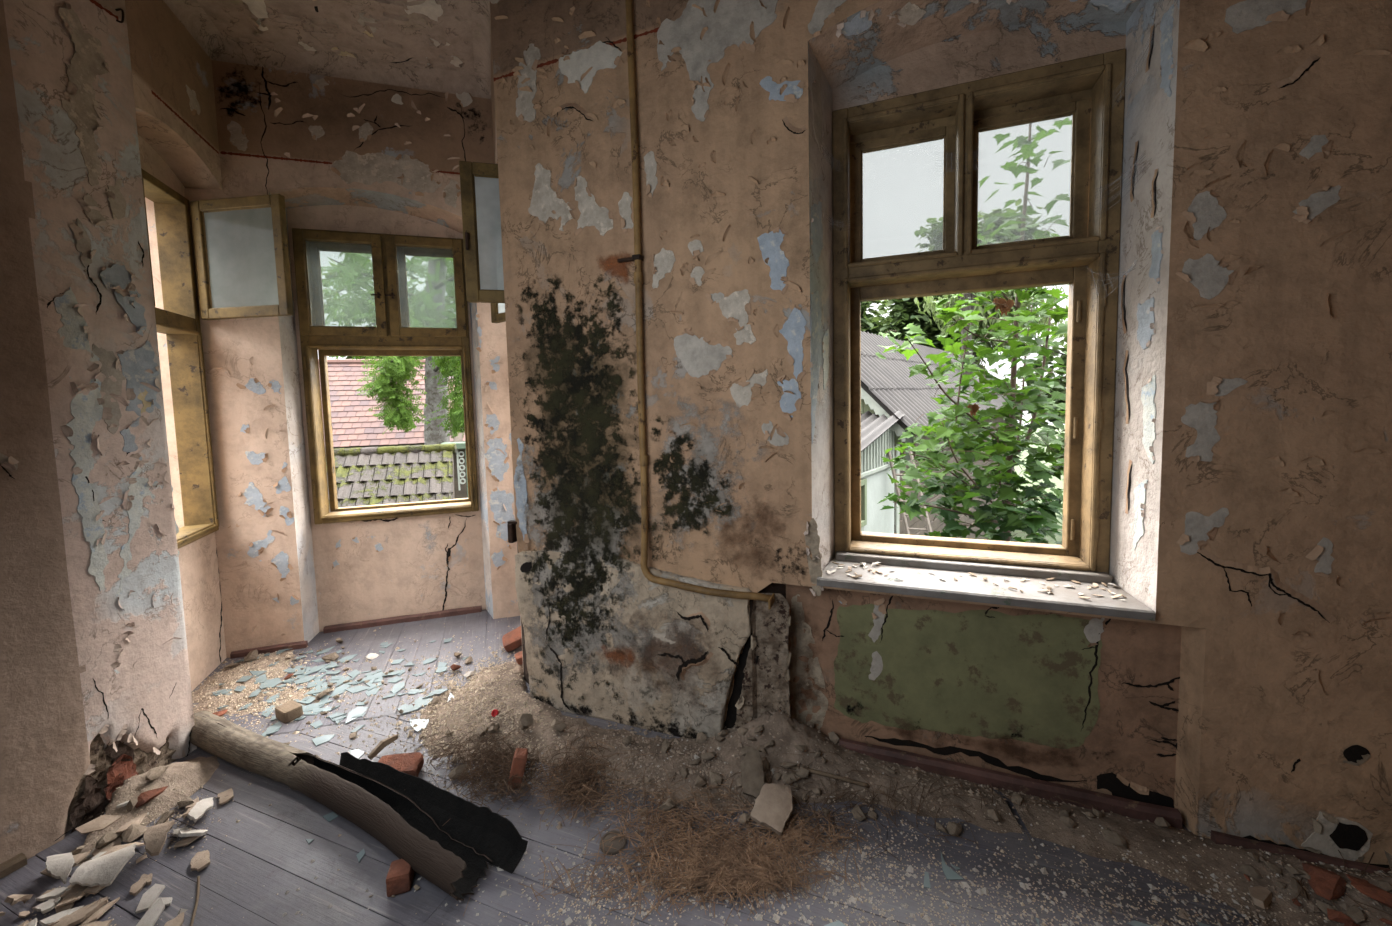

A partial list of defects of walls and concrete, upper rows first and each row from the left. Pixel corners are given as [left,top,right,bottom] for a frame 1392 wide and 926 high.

peeling [242,0,271,37]
peeling [402,0,445,21]
peeling [559,41,622,94]
peeling [528,151,658,236]
peeling [730,226,830,450]
peeling [54,218,179,596]
peeling [238,451,299,606]
crack [442,514,475,610]
peeling [484,414,529,570]
leakage [517,277,816,714]
crack [658,611,739,681]
flaking render [67,724,186,833]